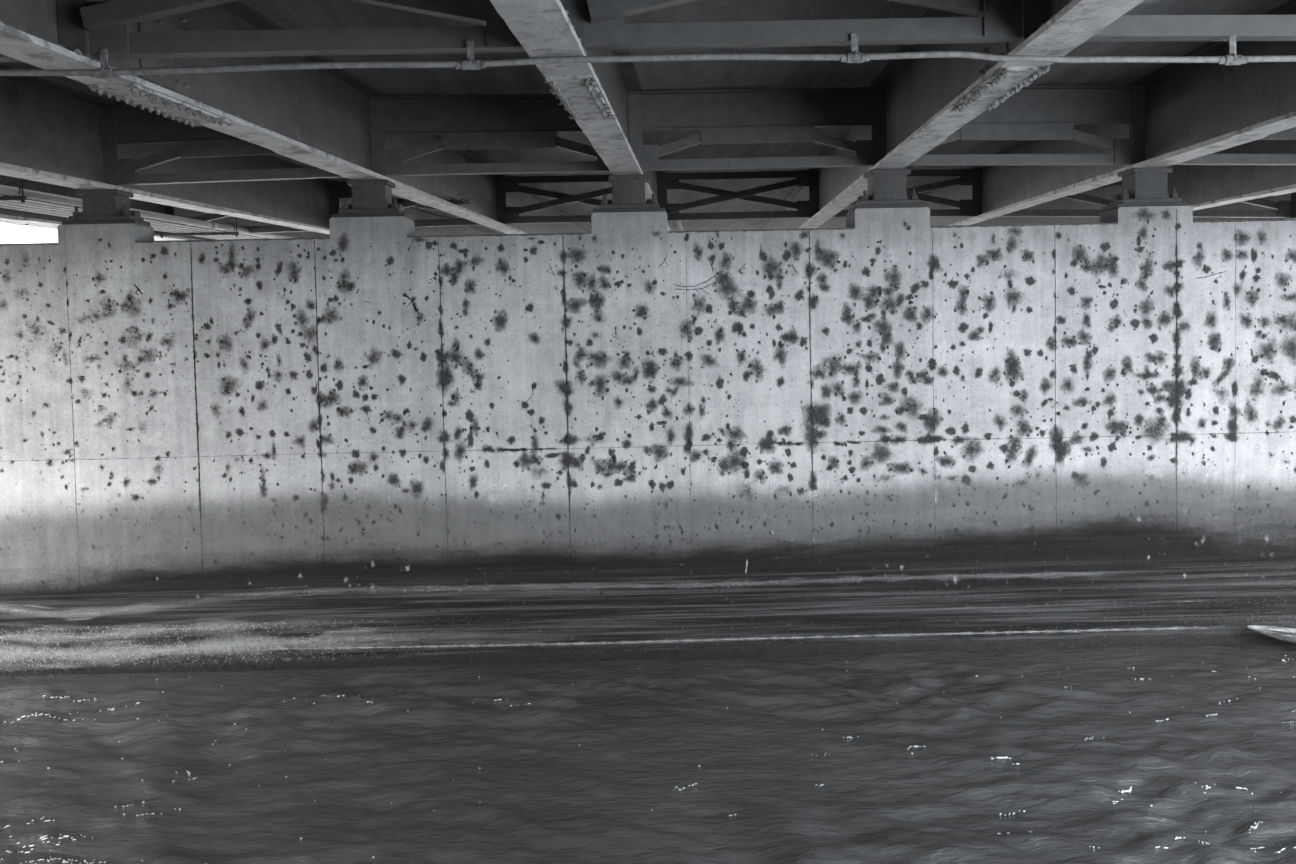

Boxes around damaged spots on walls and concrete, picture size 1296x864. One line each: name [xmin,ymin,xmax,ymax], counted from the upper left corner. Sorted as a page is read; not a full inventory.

damp [0,210,1296,676]